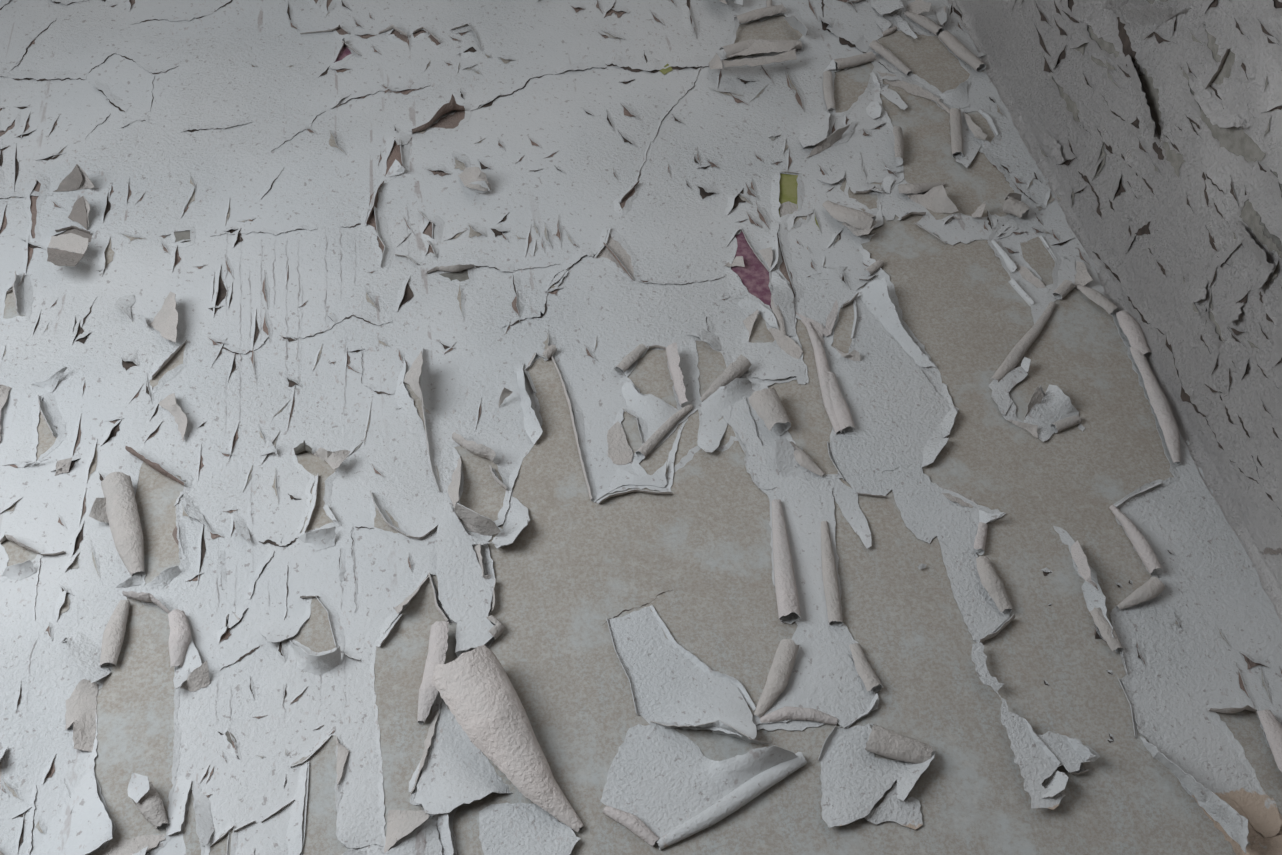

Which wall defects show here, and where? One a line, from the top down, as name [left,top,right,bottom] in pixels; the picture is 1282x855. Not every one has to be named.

crack [0,0,233,140]
crack [470,48,710,142]
crack [819,0,872,53]
peeling [0,105,234,337]
crack [180,81,431,248]
peeling [2,367,82,475]
crack [70,295,98,345]
peeling [114,292,207,443]
peeling [207,266,288,385]
crack [500,240,601,334]
peeling [0,416,124,582]
peeling [12,785,37,855]